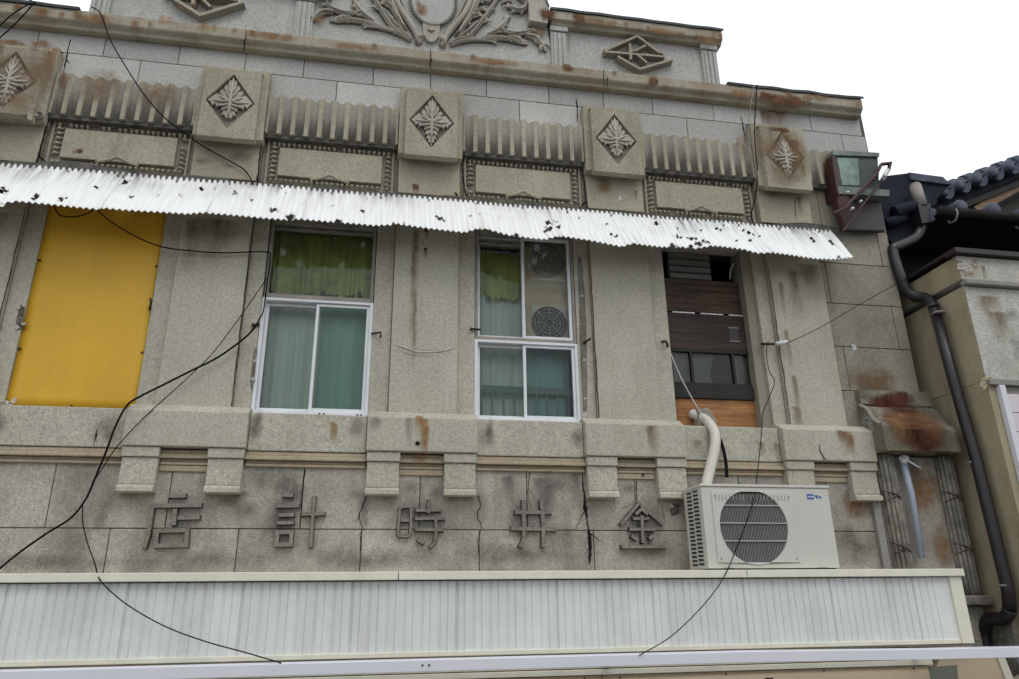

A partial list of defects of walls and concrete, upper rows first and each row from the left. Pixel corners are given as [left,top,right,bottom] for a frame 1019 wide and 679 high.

corrosion [734,90,825,152]
corrosion [417,416,428,440]
corrosion [860,374,943,451]
crack [575,473,603,564]